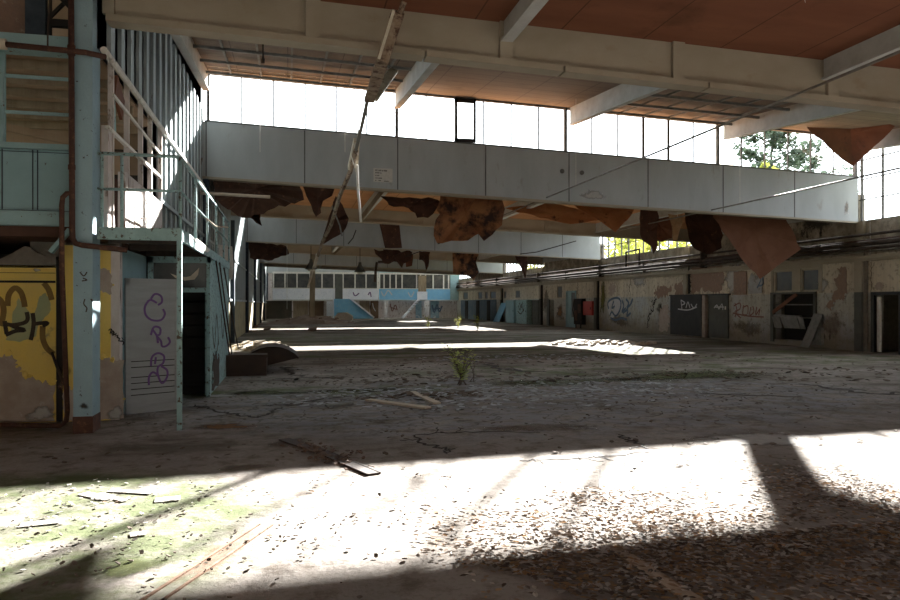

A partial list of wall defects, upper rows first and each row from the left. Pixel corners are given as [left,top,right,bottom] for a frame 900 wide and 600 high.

peeling [825,266,847,311]
peeling [0,350,73,423]
crack [400,427,540,454]